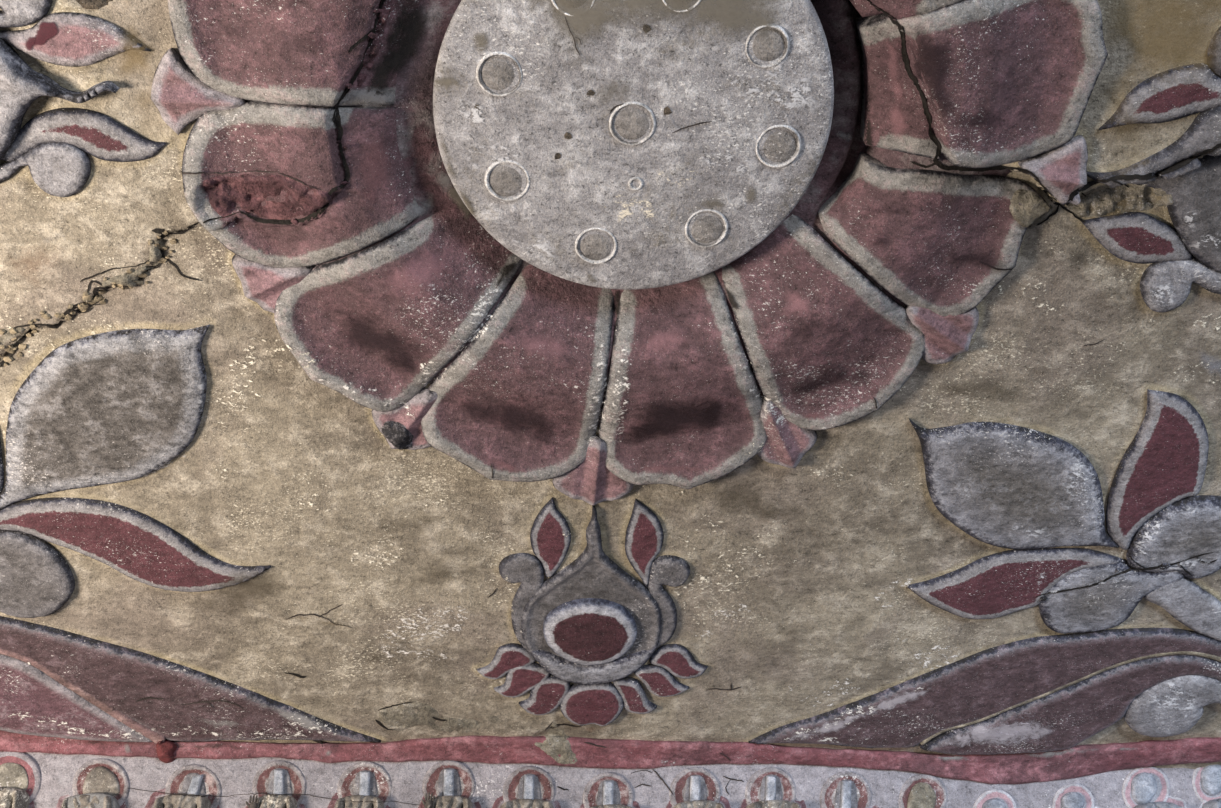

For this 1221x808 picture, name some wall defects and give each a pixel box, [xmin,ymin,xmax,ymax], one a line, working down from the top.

spalling [76,0,113,9]
crack [867,0,1221,228]
crack [0,0,392,367]
spalling [202,174,333,223]
crack [1036,552,1218,601]